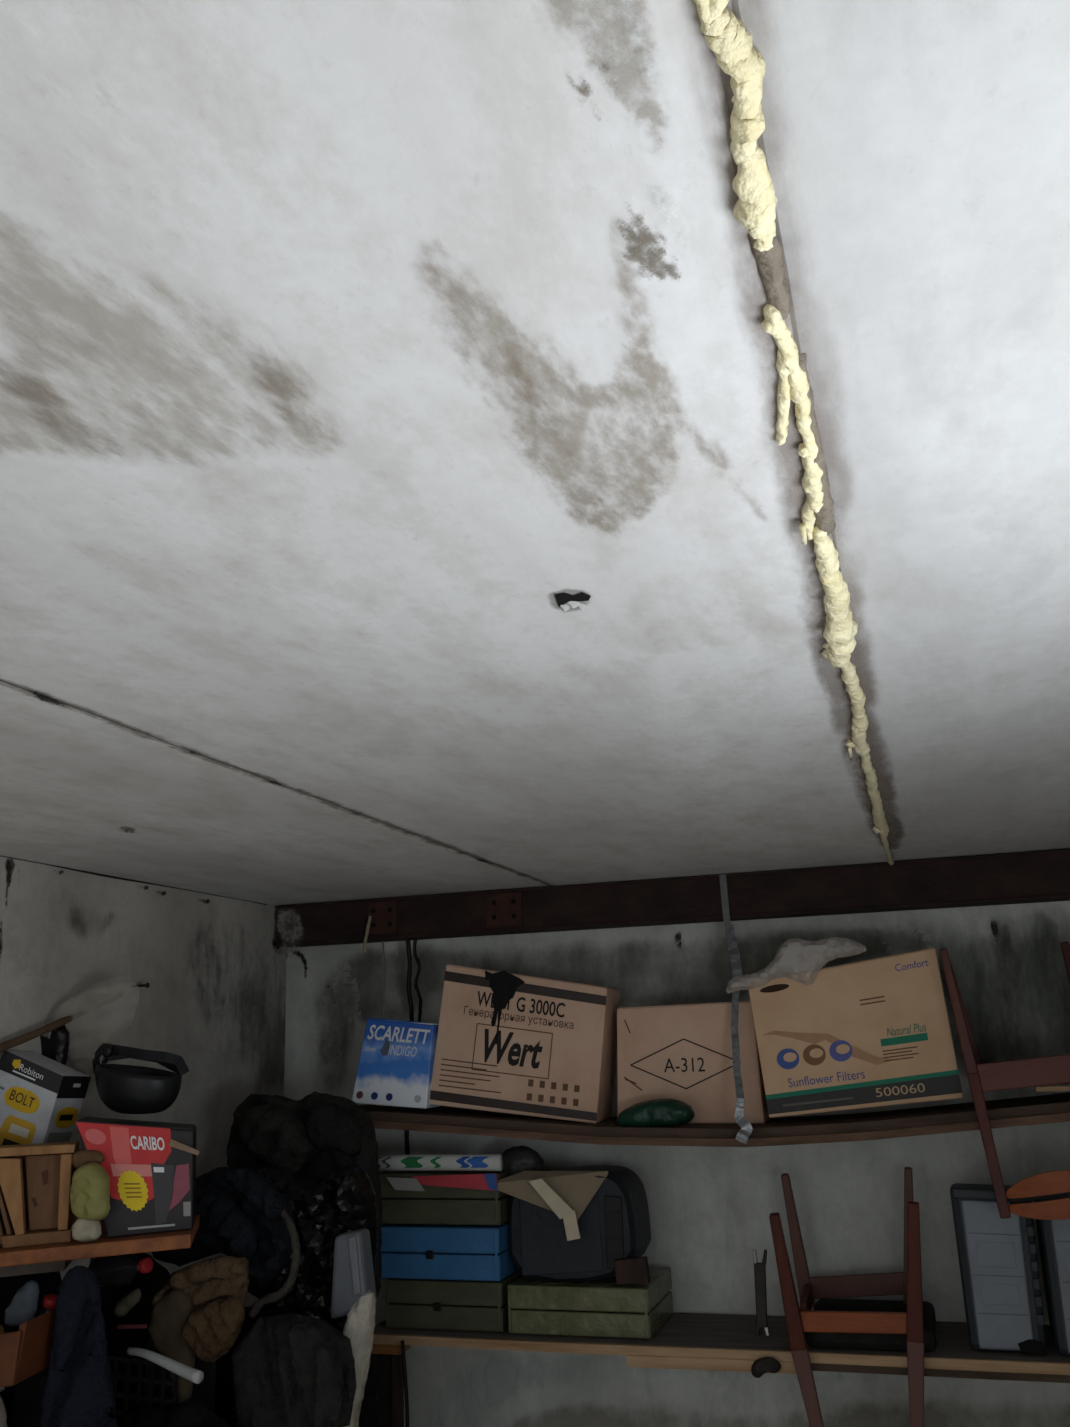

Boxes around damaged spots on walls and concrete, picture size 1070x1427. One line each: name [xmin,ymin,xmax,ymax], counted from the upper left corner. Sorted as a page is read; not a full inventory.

leakage [748,291,778,356]
leakage [773,401,902,849]
leakage [6,858,19,905]